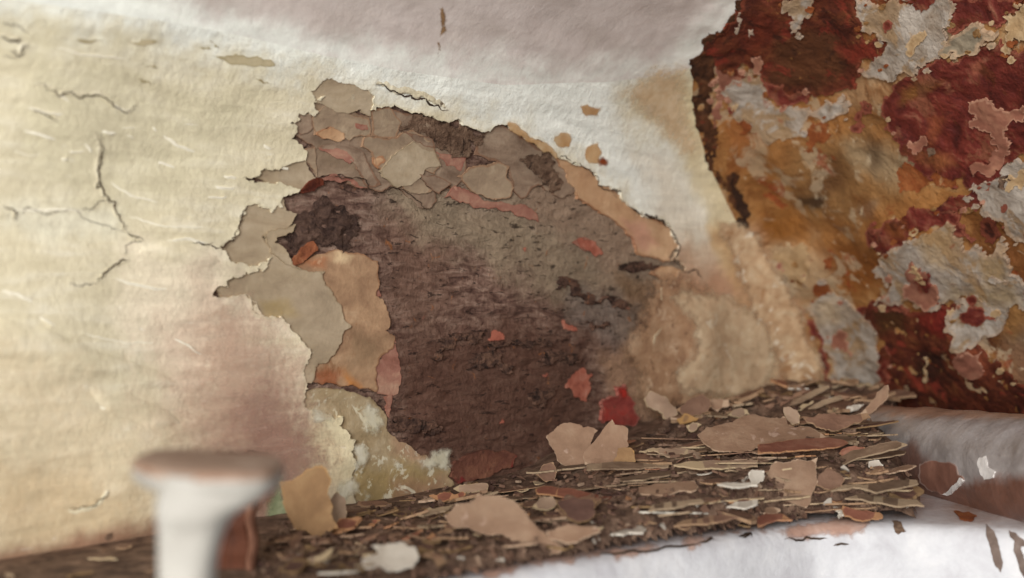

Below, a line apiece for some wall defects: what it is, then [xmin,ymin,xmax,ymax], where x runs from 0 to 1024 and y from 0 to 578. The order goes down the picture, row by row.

crack [0,23,30,59]
crack [29,82,136,122]
water stain [632,70,696,153]
corrosion [711,0,887,134]
crack [2,132,143,287]
corrosion [865,162,982,255]
peeling [213,0,964,578]
corrosion [812,284,830,297]
corrosion [856,300,1024,414]
water stain [338,444,368,499]
water stain [363,405,383,433]
water stain [423,450,449,469]